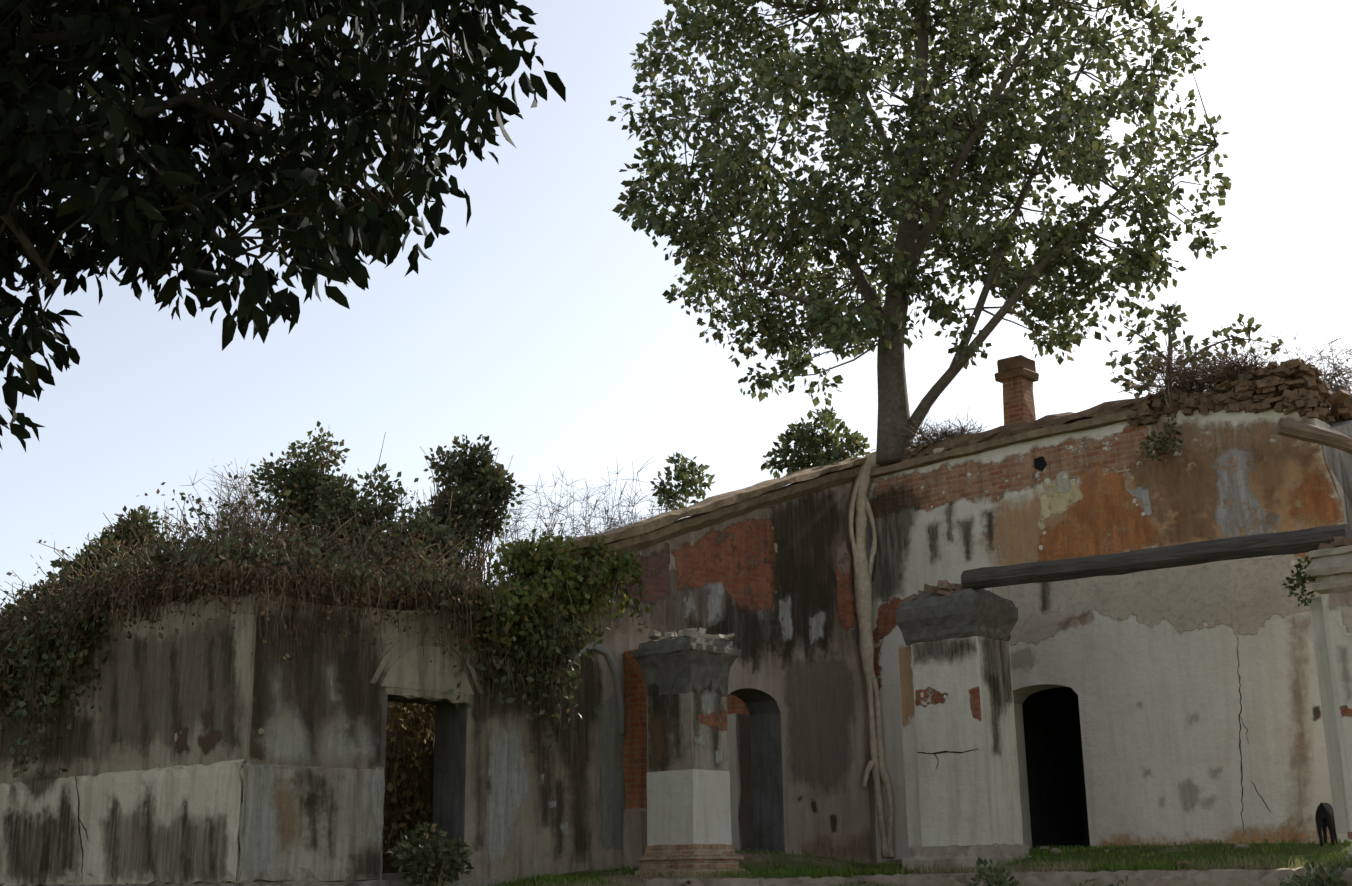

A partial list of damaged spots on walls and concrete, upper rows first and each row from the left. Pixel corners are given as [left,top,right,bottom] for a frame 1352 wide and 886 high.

spalling [868,424,1158,561]
water stain [0,609,382,850]
spalling [610,518,795,642]
water stain [608,493,854,792]
spalling [809,541,963,695]
spalling [899,647,948,726]
crack [917,749,977,769]
spalling [969,687,981,721]
peeling [992,552,1352,646]
crack [1236,635,1272,834]
water stain [5,799,78,886]
water stain [104,796,226,884]